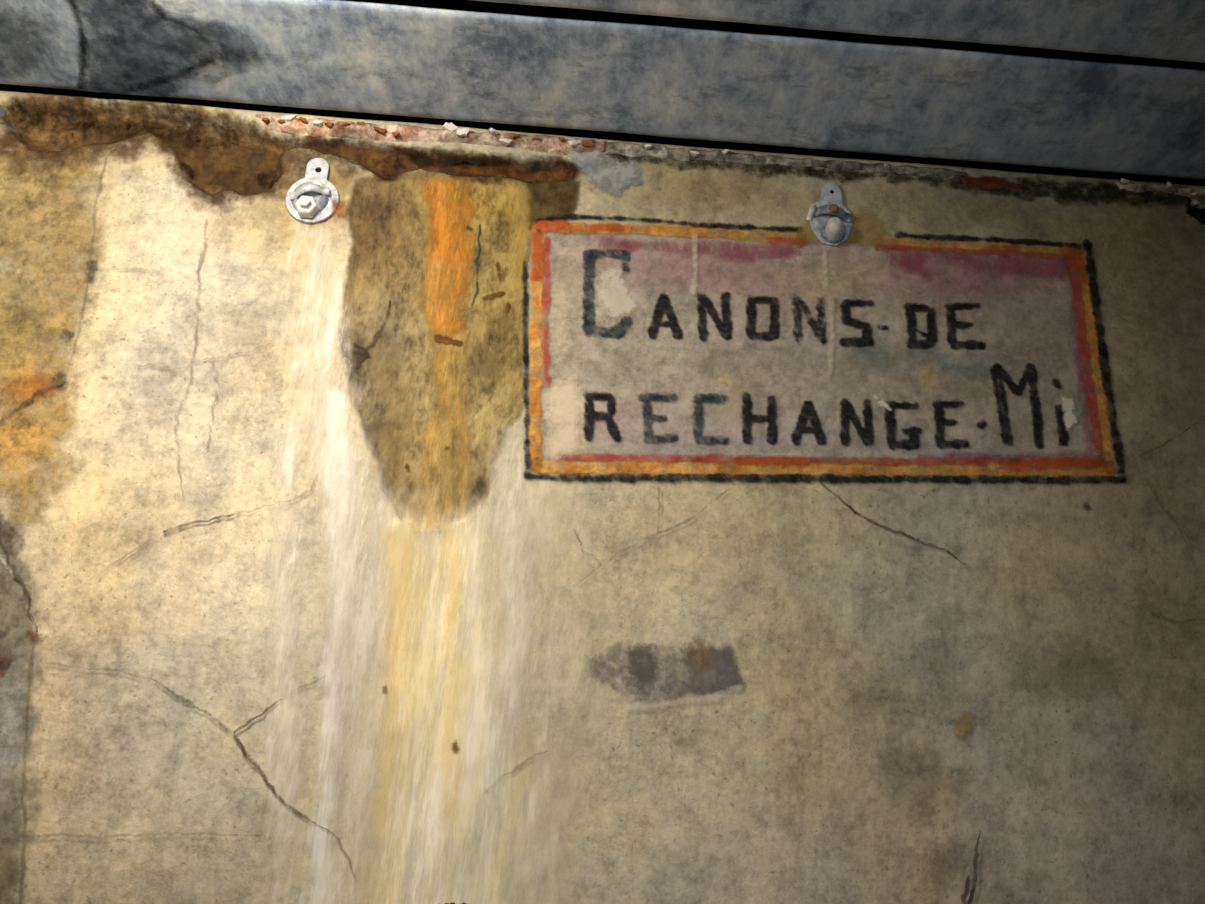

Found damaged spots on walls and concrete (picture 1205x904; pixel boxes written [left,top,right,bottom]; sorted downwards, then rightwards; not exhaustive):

crack [10,379,66,414]
crack [0,537,38,632]
crack [163,514,234,533]
water stain [267,232,741,904]
crack [164,687,335,835]
crack [961,830,981,904]